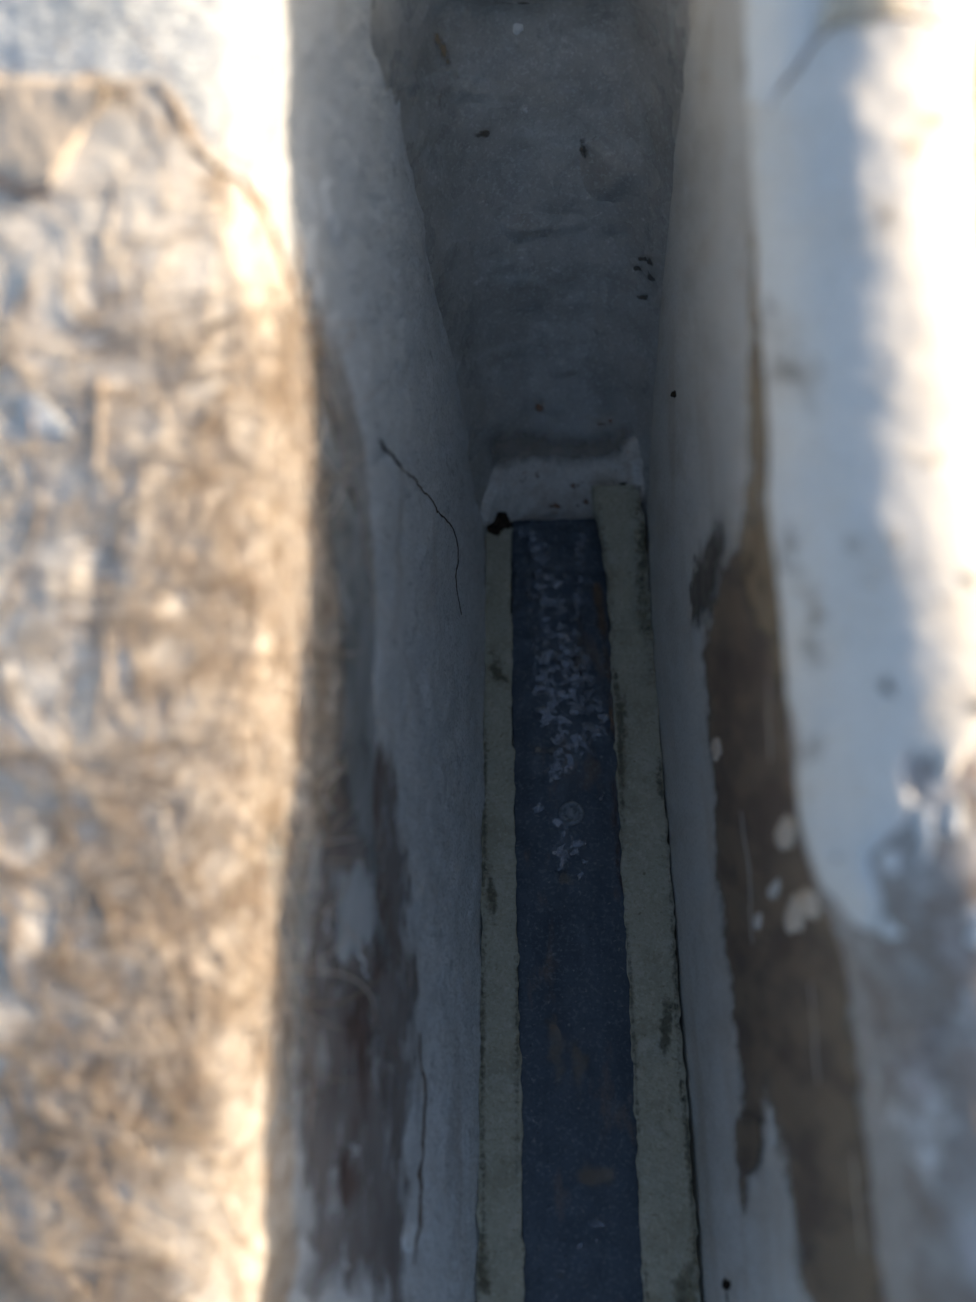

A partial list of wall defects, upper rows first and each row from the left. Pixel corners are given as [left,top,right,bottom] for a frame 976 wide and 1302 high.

crack [378,439,462,615]
peeling [744,0,976,938]
water stain [297,742,419,1302]
crack [722,1278,731,1302]
peeling [767,1106,777,1148]
water stain [702,550,884,1302]